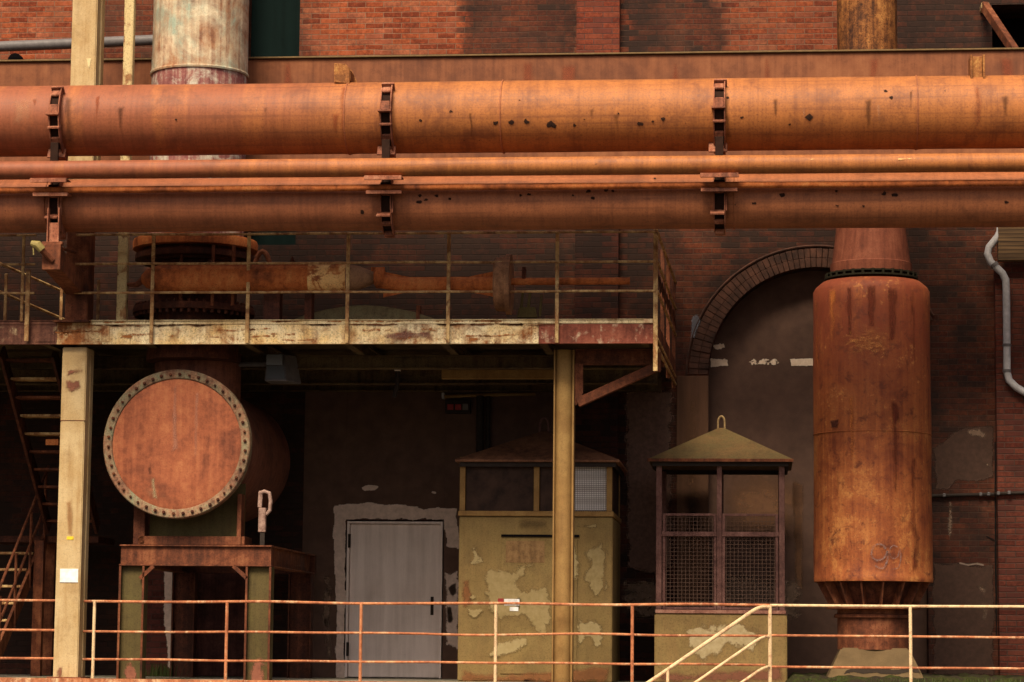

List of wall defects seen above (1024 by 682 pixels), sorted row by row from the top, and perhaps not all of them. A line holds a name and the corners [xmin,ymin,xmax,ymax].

corrosion [55,320,562,341]
peeling [710,343,728,367]
peeling [751,358,813,366]
peeling [574,543,608,596]
peeling [445,548,552,656]
peeling [577,620,603,647]
peeling [686,624,757,661]